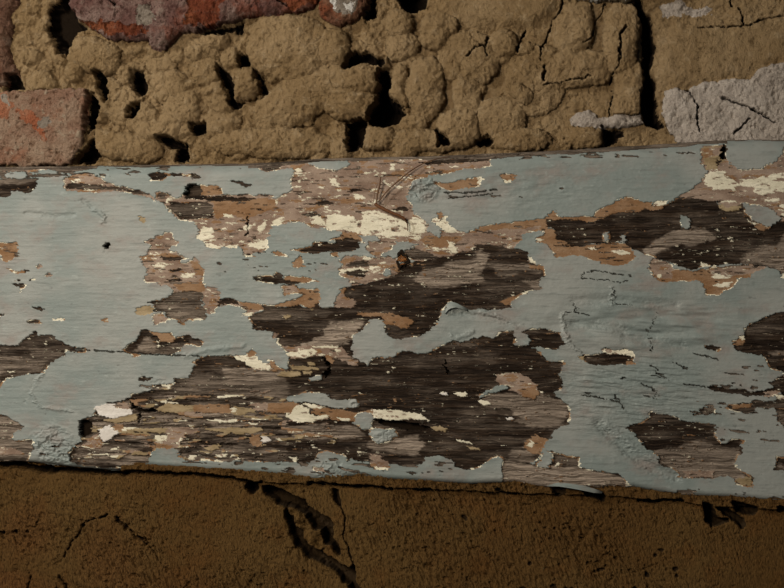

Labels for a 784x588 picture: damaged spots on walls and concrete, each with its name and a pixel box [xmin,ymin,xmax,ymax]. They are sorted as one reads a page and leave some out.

crack [609,26,628,116]
crack [688,91,700,132]
crack [719,99,772,160]
peeling [0,144,784,529]
crack [0,461,393,588]
crack [637,496,685,504]